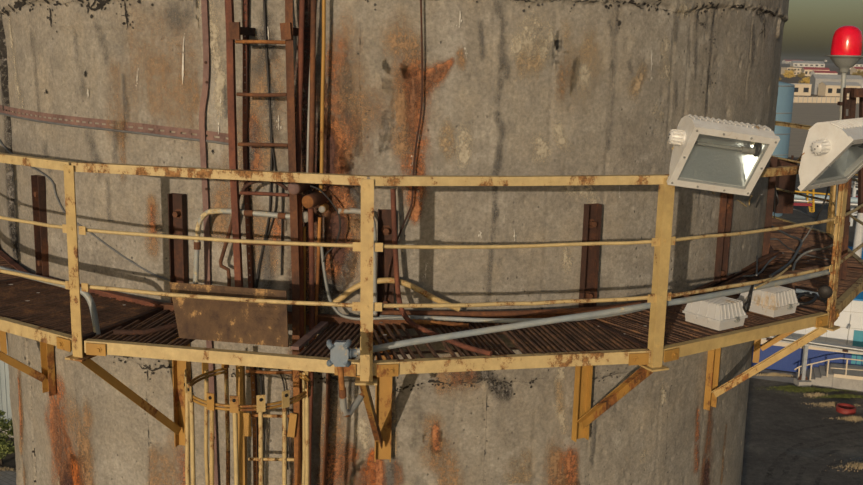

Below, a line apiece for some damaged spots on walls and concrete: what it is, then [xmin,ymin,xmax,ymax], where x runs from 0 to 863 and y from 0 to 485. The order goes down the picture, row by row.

damp [200,0,228,117]
rust [388,27,465,175]
rust [406,186,424,222]
rust [46,378,93,485]
rust [549,447,578,485]
rust [695,407,713,485]